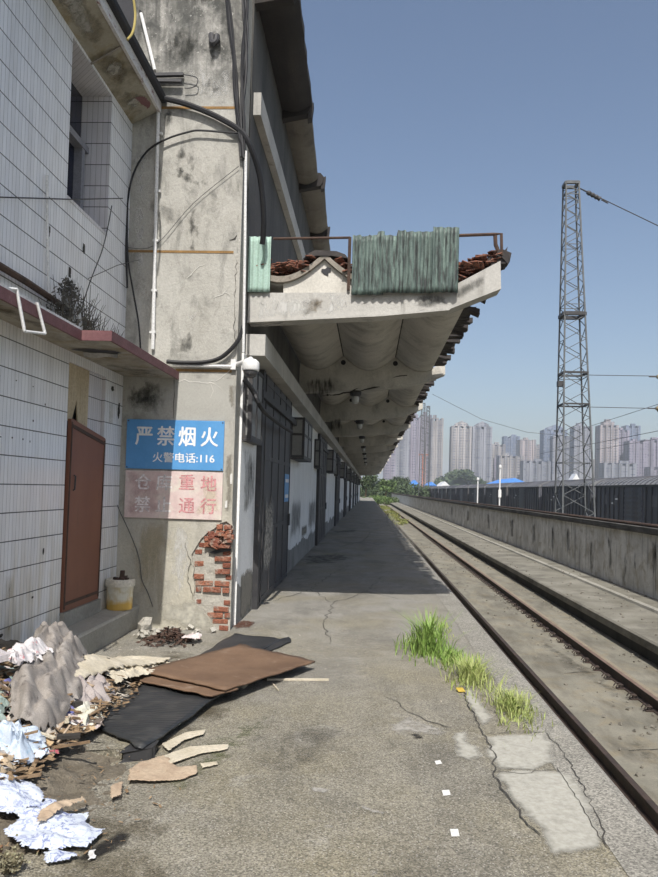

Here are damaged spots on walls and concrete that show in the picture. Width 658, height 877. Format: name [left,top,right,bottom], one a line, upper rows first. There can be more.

water stain [174,33,196,57]
spalling [162,521,252,631]
crack [273,566,398,644]
crack [464,683,608,846]